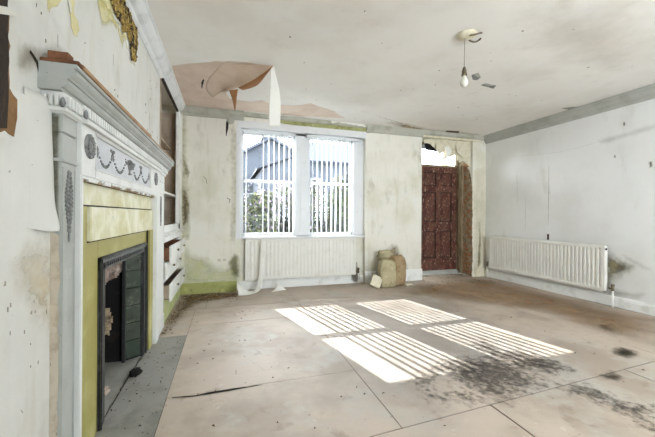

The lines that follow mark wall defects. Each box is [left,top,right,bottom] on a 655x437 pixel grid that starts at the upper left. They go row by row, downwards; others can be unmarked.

peeling [41,0,79,37]
spalling [102,0,138,65]
mould [607,258,626,280]